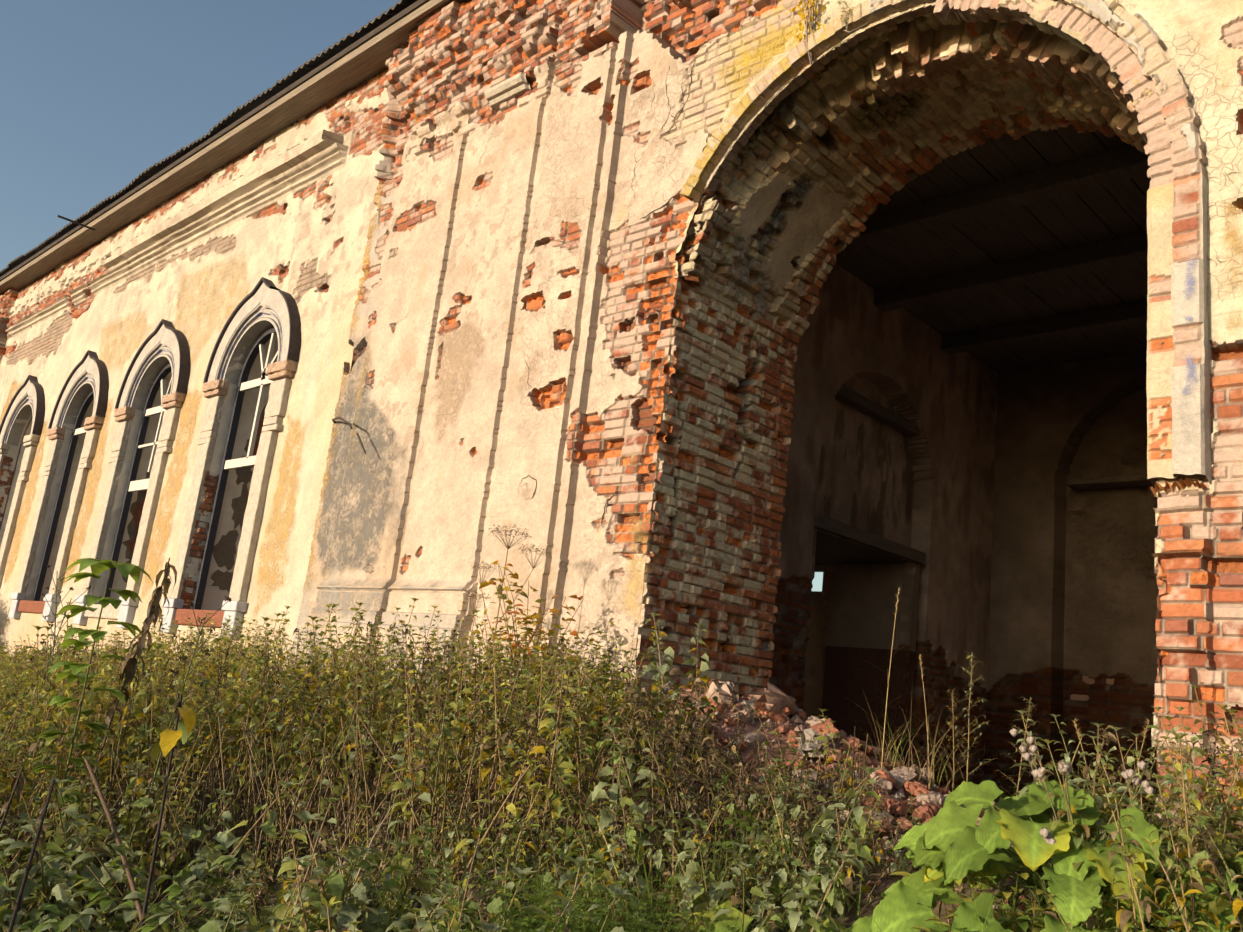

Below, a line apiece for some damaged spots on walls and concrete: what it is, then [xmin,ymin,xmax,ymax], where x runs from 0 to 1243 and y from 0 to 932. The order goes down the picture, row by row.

spalling [1218,12,1243,86]
spalling [815,126,841,158]
spalling [1234,105,1243,137]
spalling [0,0,816,391]
spalling [1230,193,1243,212]
flaking render [520,186,711,582]
flaking render [0,456,14,532]
peeling [180,402,268,609]
flaking render [1147,317,1243,839]